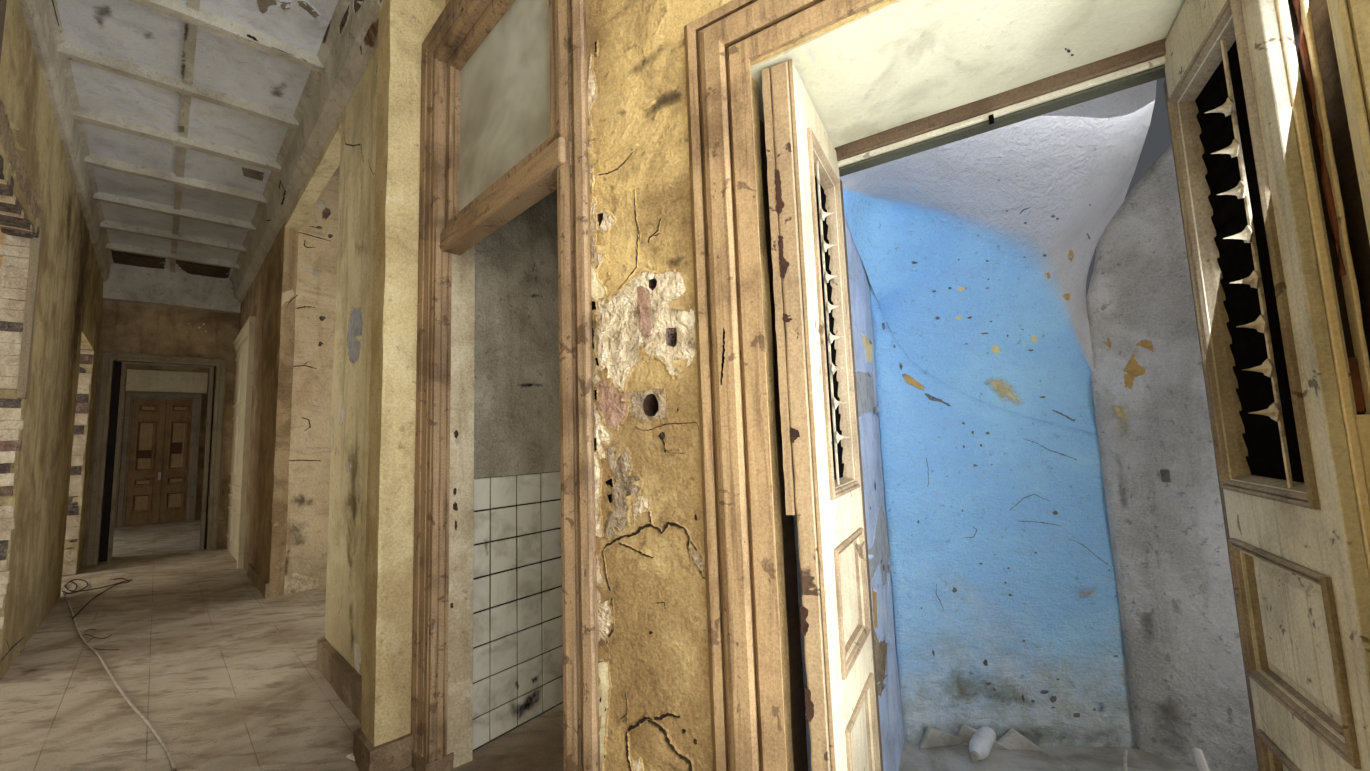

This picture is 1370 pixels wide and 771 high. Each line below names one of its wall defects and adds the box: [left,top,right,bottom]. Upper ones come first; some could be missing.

flaking render [592,268,697,555]
peeling [1122,339,1155,391]
crack [599,511,706,771]
peeling [868,483,893,698]
peeling [631,756,645,771]